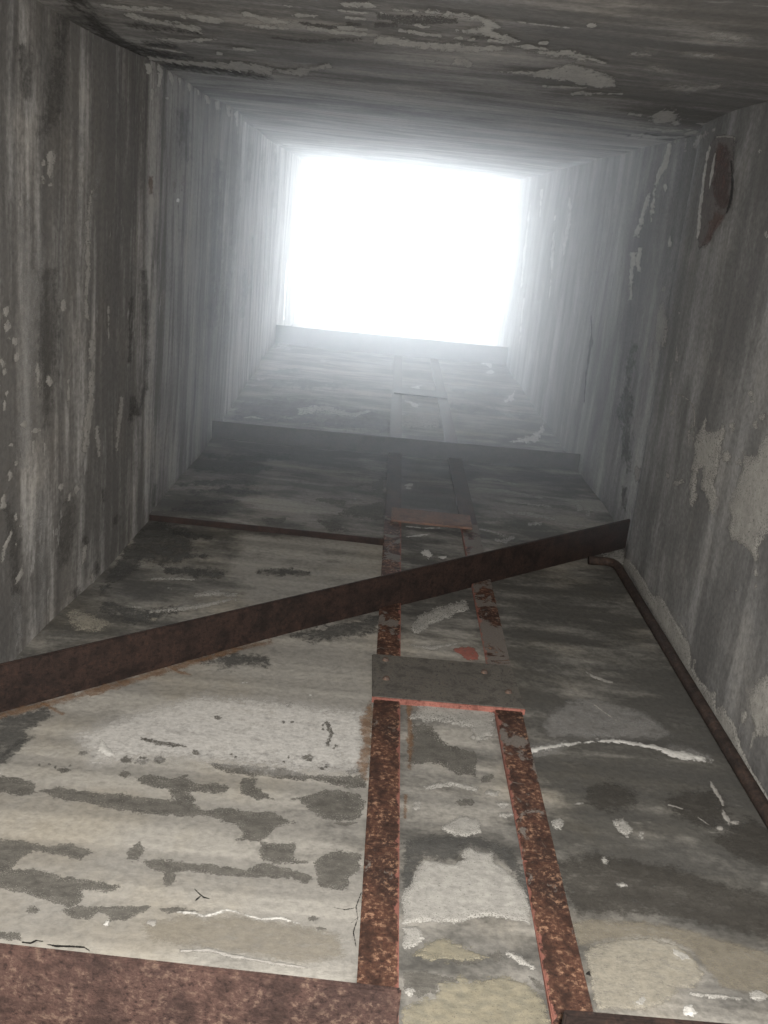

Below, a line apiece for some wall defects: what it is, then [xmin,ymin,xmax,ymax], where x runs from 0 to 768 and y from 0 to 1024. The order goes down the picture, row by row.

peeling [242,2,623,96]
peeling [673,413,768,576]
leakage [99,521,224,625]
leakage [257,568,310,577]
leakage [0,707,52,763]
leakage [80,697,365,772]
leakage [531,738,714,763]
leakage [665,789,768,865]
leakage [557,852,768,996]